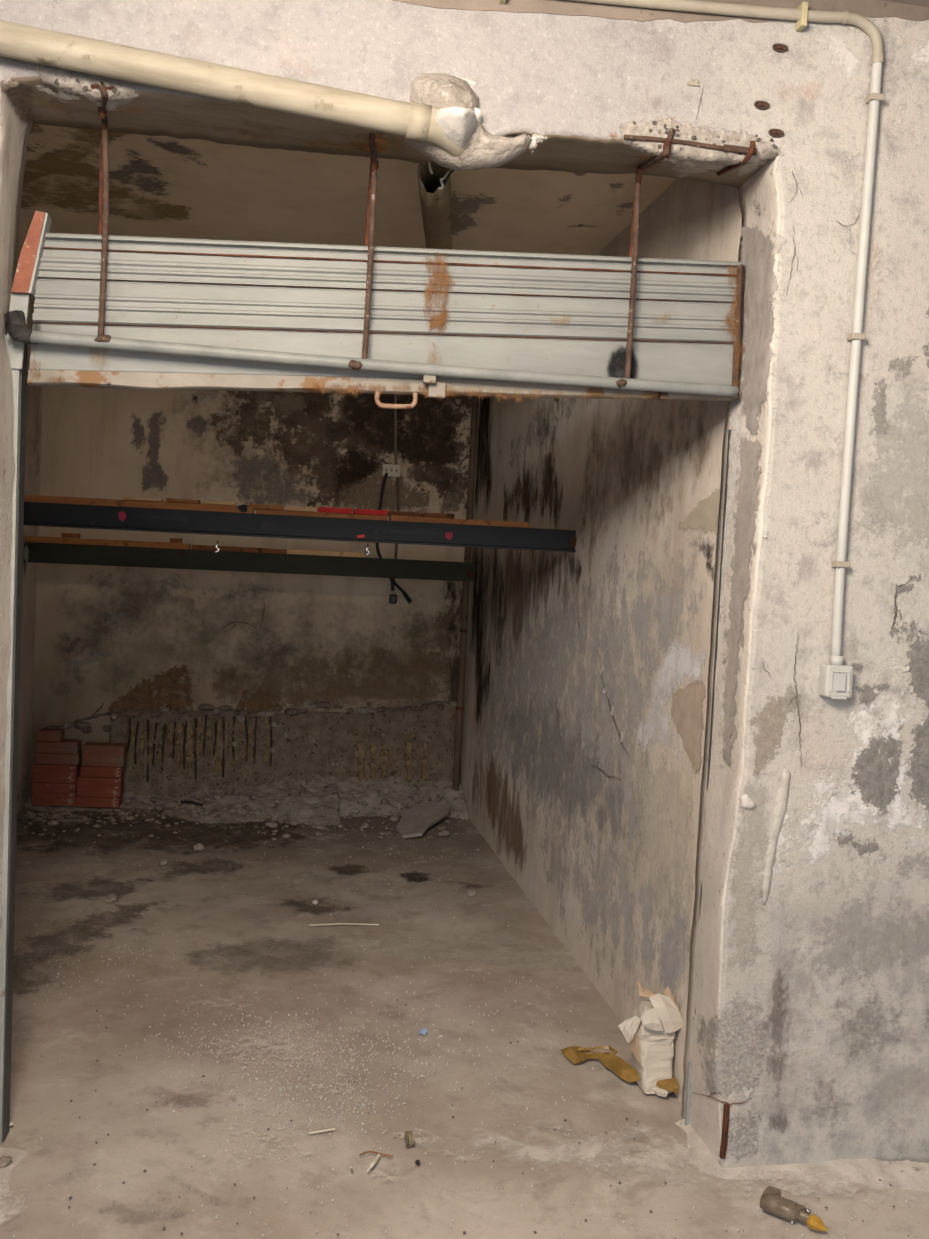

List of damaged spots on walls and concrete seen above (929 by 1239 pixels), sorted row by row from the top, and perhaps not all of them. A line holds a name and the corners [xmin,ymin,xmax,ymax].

water stain [21,125,188,220]
water stain [148,139,205,165]
spalling [619,116,784,379]
water stain [131,412,168,491]
water stain [186,391,588,526]
water stain [192,420,707,1006]
crack [763,632,802,768]
water stain [728,686,929,972]